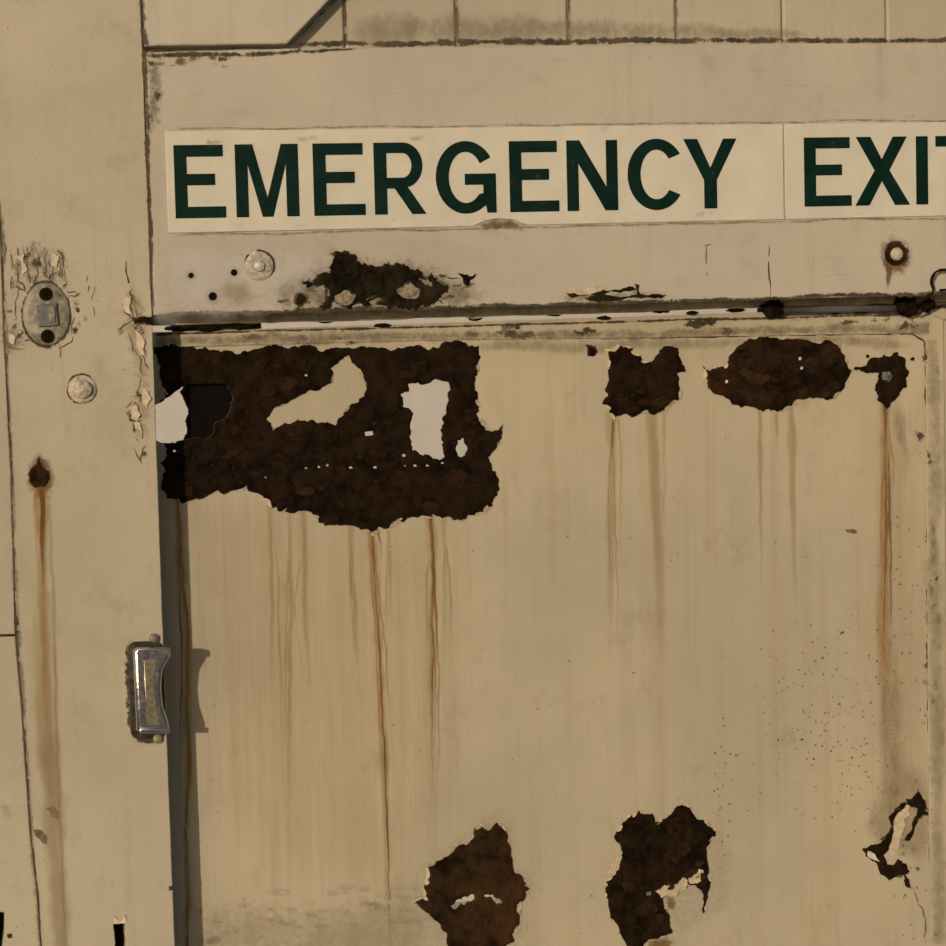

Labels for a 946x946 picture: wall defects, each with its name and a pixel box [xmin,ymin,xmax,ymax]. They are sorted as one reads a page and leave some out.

rust [883,241,909,283]
rust [28,456,52,564]
rust [703,336,915,612]
rust [154,340,503,900]
peeling [862,788,929,938]